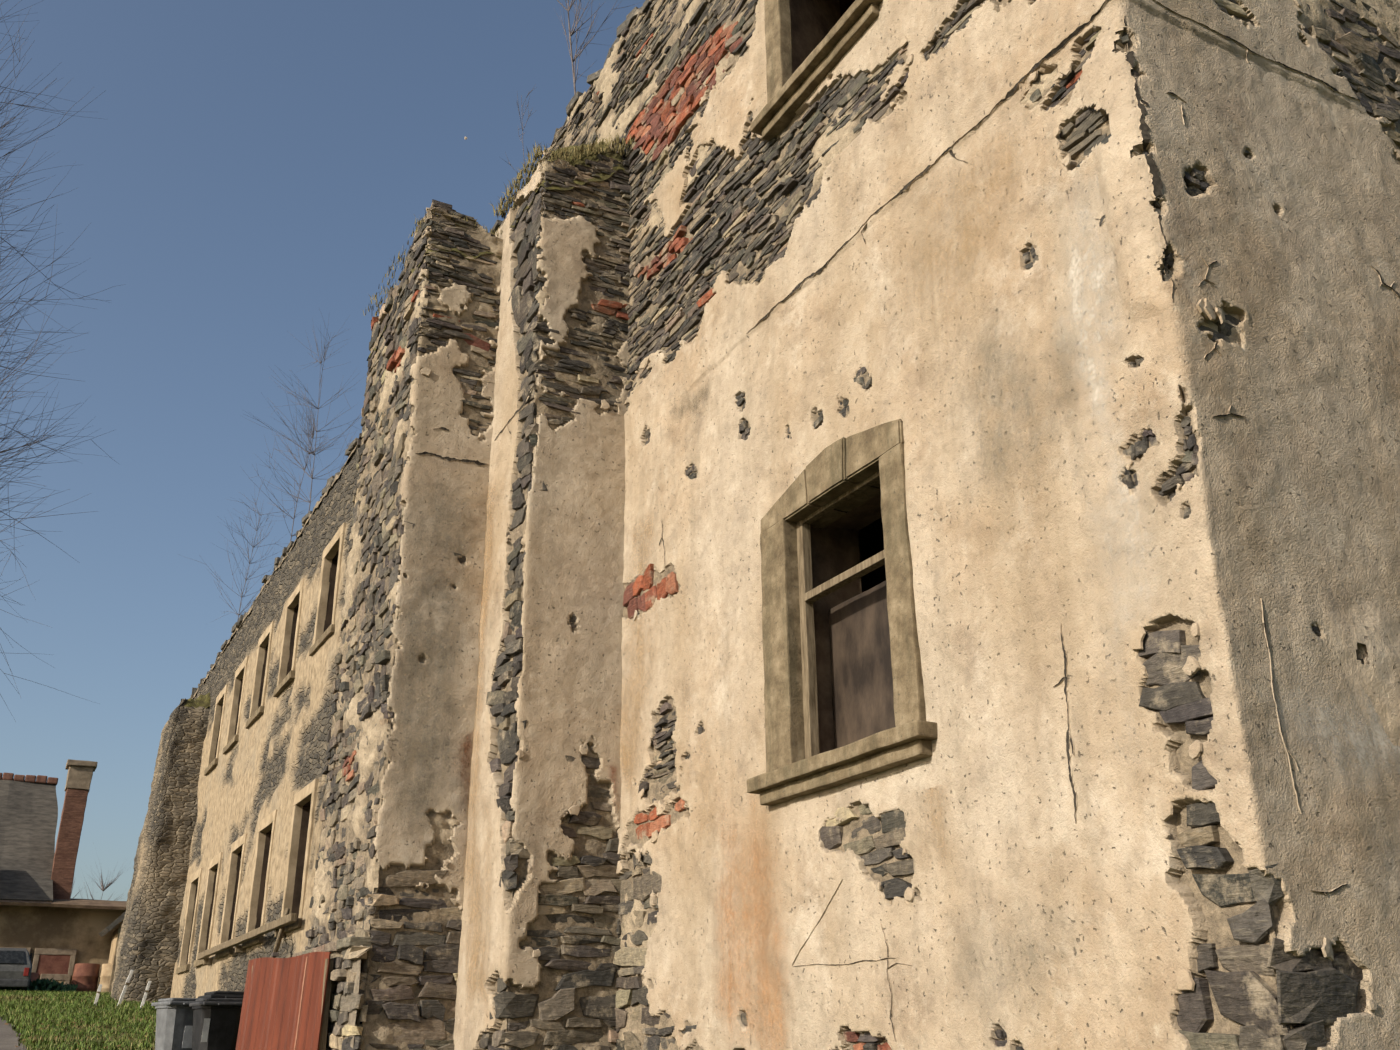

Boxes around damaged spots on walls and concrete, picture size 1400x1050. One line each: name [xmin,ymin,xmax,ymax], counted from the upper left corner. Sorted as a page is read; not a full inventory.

crack [746,0,1360,334]
spalling [1021,30,1111,168]
spalling [1183,168,1211,197]
spalling [1294,0,1400,165]
spalling [1162,251,1174,281]
spalling [1196,298,1241,343]
spalling [305,0,1011,1050]
spalling [1121,429,1160,489]
spalling [1159,394,1199,519]
crack [1053,624,1078,824]
crack [1260,598,1302,814]
spalling [1130,619,1377,1050]